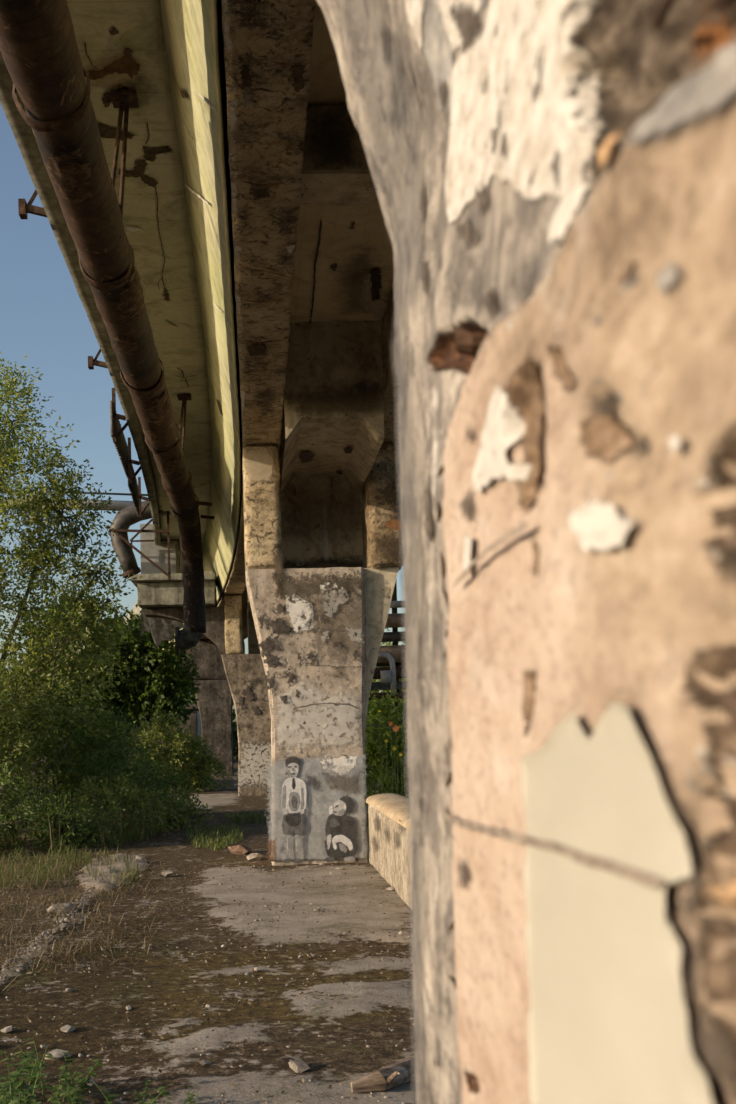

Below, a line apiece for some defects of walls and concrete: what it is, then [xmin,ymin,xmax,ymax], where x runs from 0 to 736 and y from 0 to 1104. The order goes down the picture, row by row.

peeling [405,0,736,247]
spalling [459,345,577,521]
flaking render [463,535,472,577]
flaking render [567,500,633,552]
peeling [238,581,365,789]